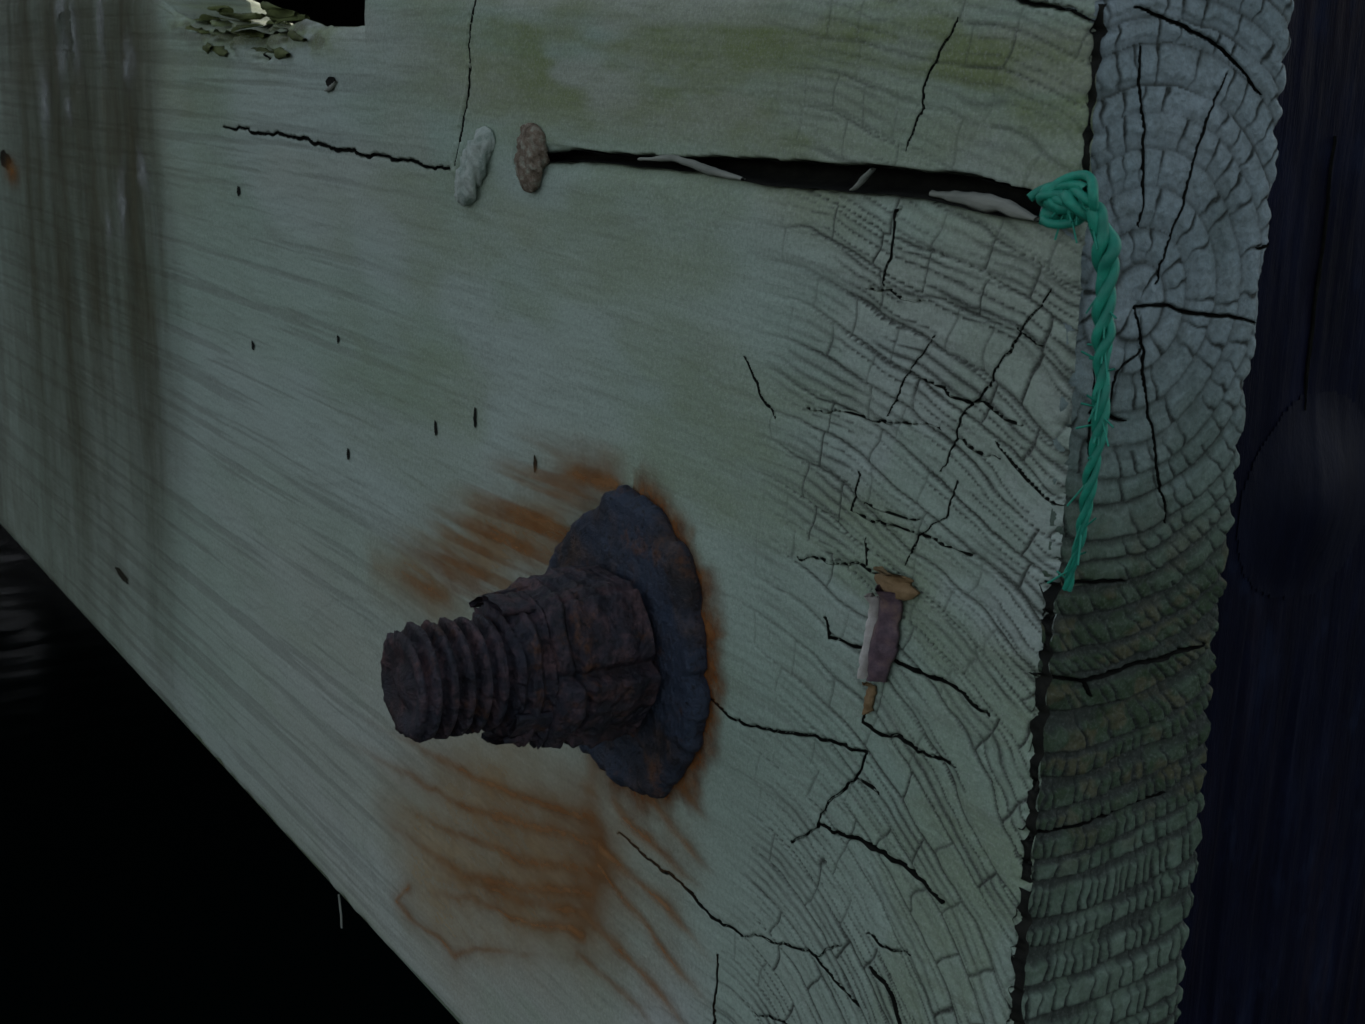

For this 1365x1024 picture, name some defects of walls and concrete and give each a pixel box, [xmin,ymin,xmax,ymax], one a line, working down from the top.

damp [53,0,156,360]
crack [223,0,476,170]
crack [548,17,1041,302]
crack [1017,0,1262,523]
crack [743,288,1065,574]
corrosion [469,586,536,616]
corrosion [481,730,539,745]
crack [711,698,956,904]
crack [823,616,862,649]
crack [894,658,991,717]
crack [1006,579,1206,1024]
crack [618,832,911,1024]